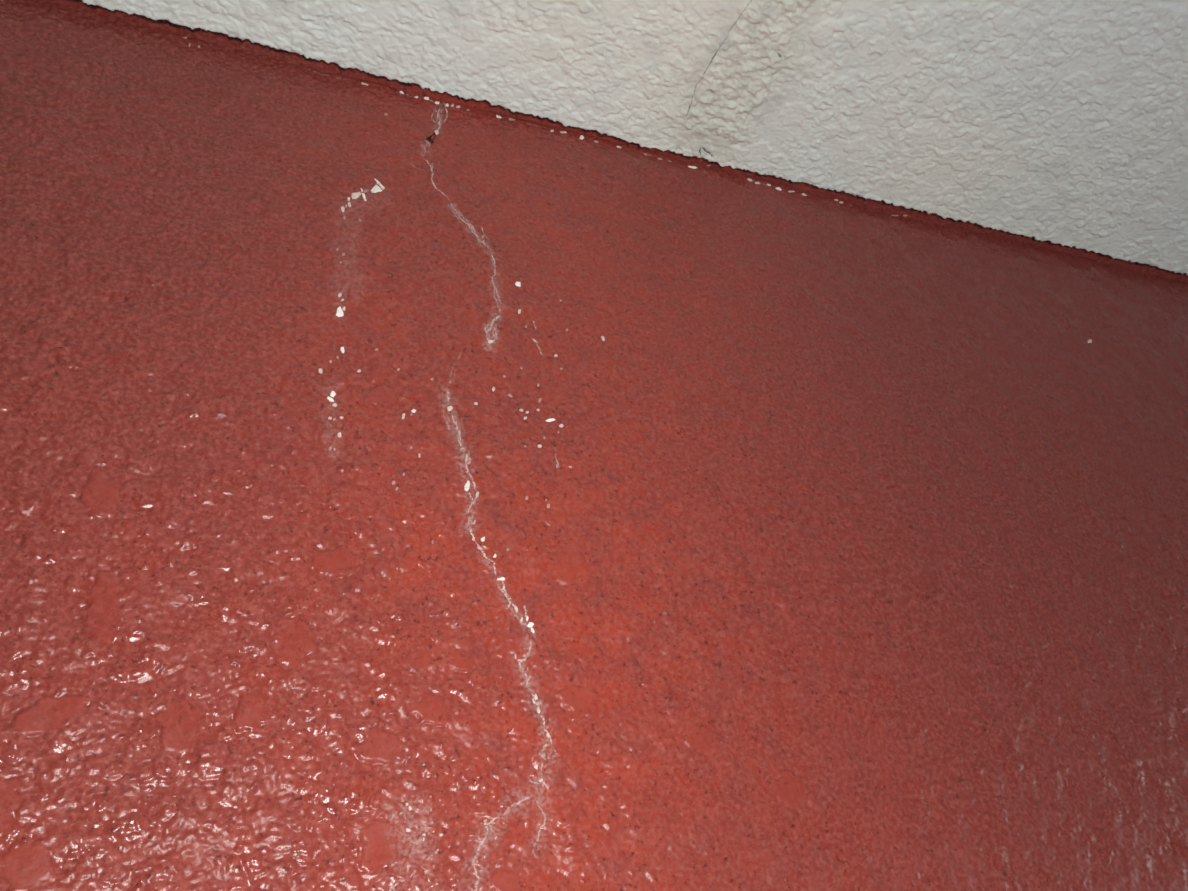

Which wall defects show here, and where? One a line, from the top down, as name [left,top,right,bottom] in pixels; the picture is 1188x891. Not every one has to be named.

crack [424,103,500,344]
crack [447,392,552,887]